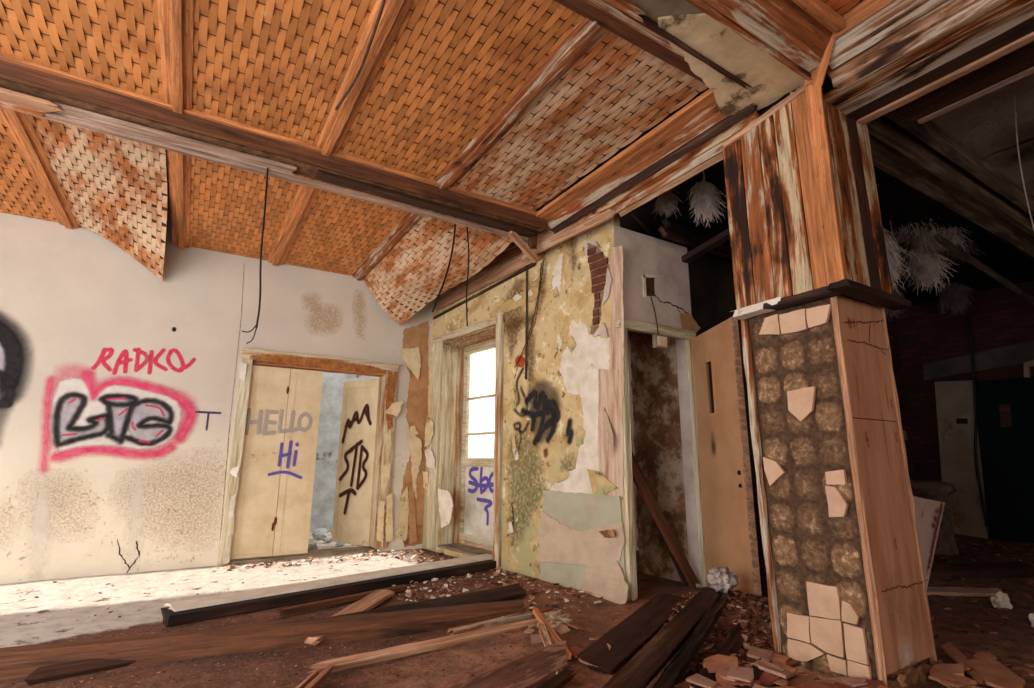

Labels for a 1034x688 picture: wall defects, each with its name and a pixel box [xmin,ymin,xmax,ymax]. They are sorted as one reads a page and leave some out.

crack [117,539,140,573]
peeling [239,321,453,547]
peeling [511,435,519,461]
peeling [551,238,625,498]